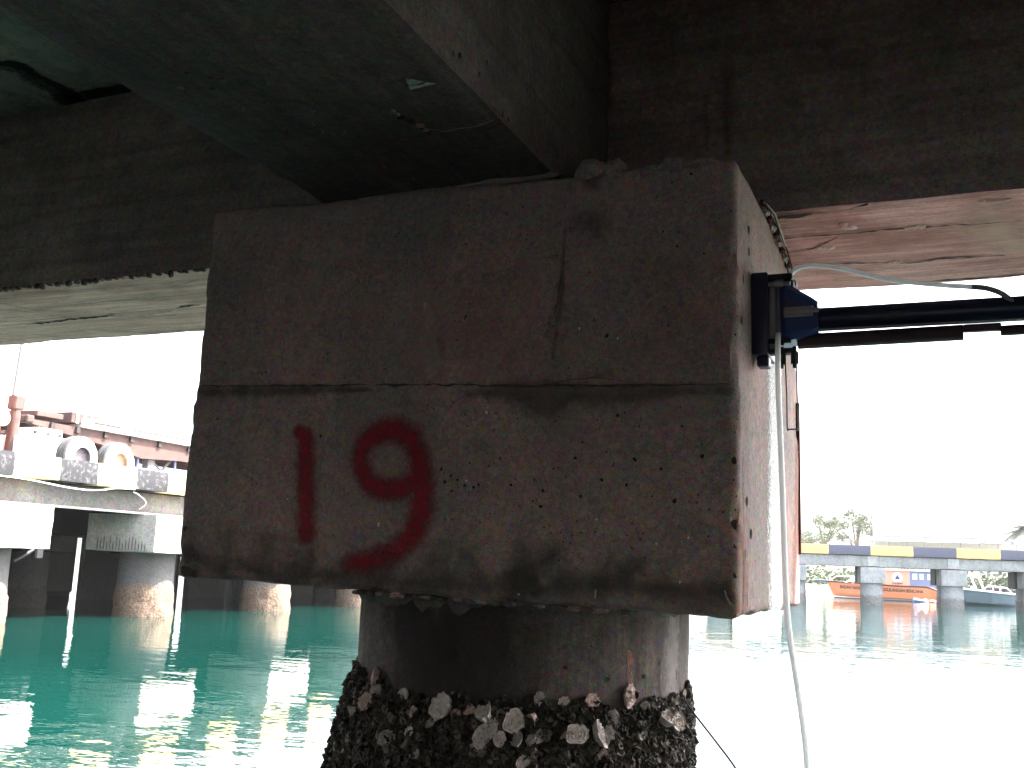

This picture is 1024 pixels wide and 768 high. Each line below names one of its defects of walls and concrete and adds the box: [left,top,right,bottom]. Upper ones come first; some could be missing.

crack [0,60,132,105]
crack [196,377,736,387]